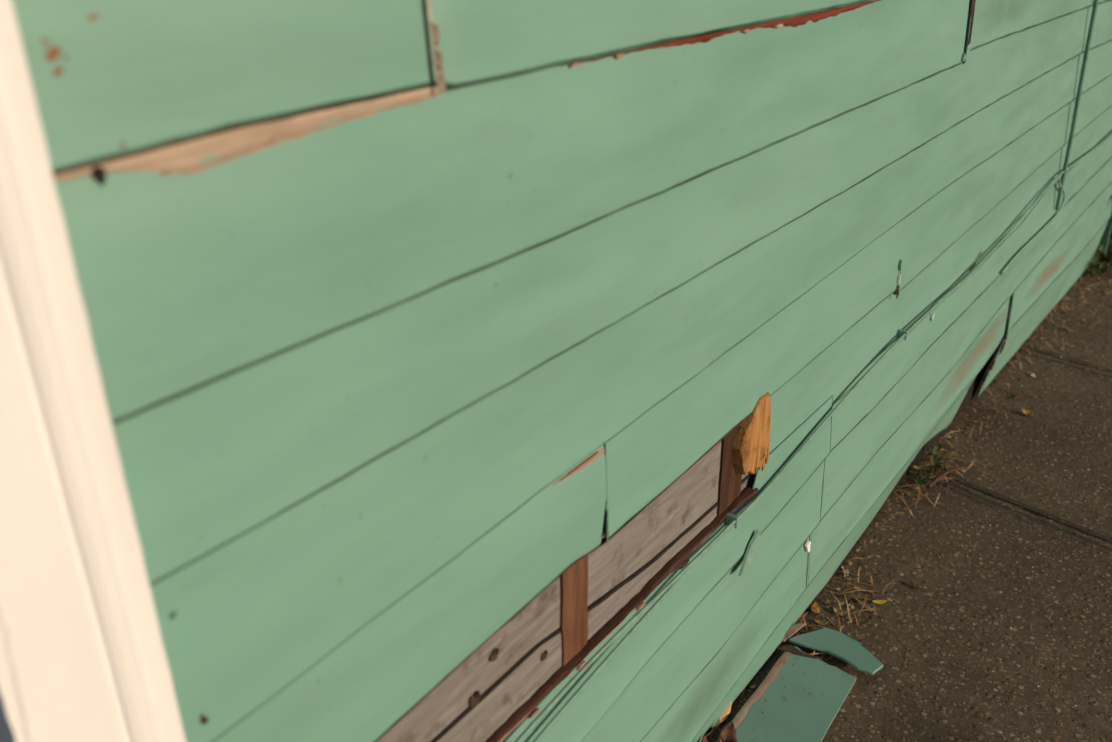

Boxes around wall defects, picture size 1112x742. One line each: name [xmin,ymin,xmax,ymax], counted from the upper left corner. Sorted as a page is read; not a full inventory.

peeling [560,0,881,68]
peeling [53,83,440,185]
peeling [553,447,605,486]